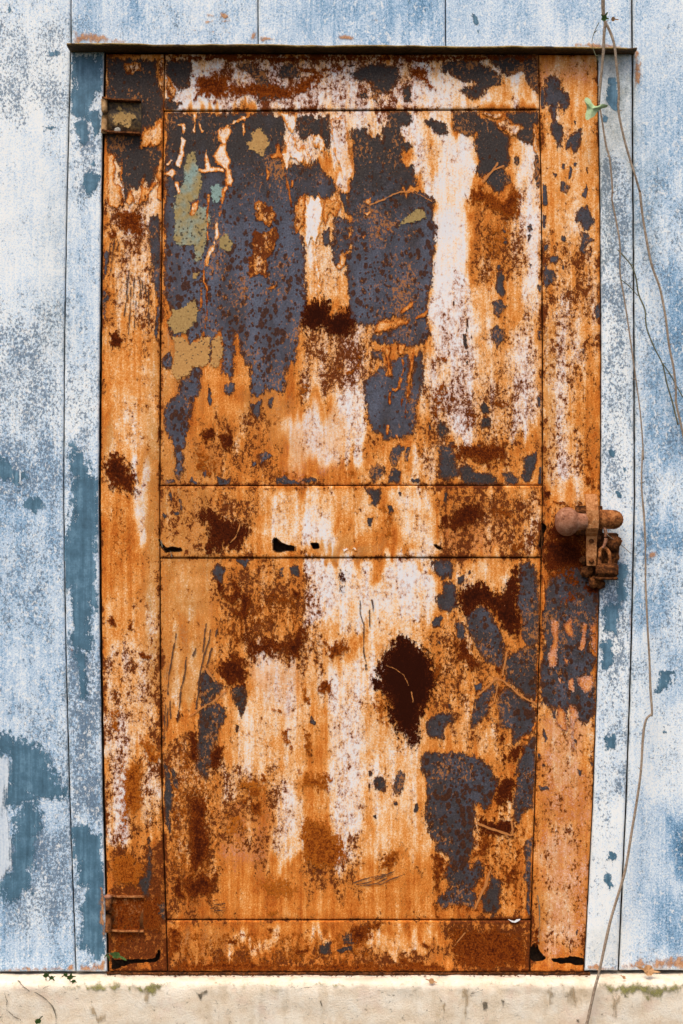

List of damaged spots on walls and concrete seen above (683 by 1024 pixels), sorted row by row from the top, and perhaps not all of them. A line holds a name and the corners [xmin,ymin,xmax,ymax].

rust [165,54,539,105]
peeling [49,48,595,527]
rust [296,294,358,340]
peeling [64,441,99,702]
rust [212,579,309,692]
rust [371,628,506,751]
rust [453,538,527,640]
peeling [430,559,629,824]
peeling [0,729,69,910]
peeling [71,822,106,963]
rust [100,728,540,972]
peeling [414,704,533,923]